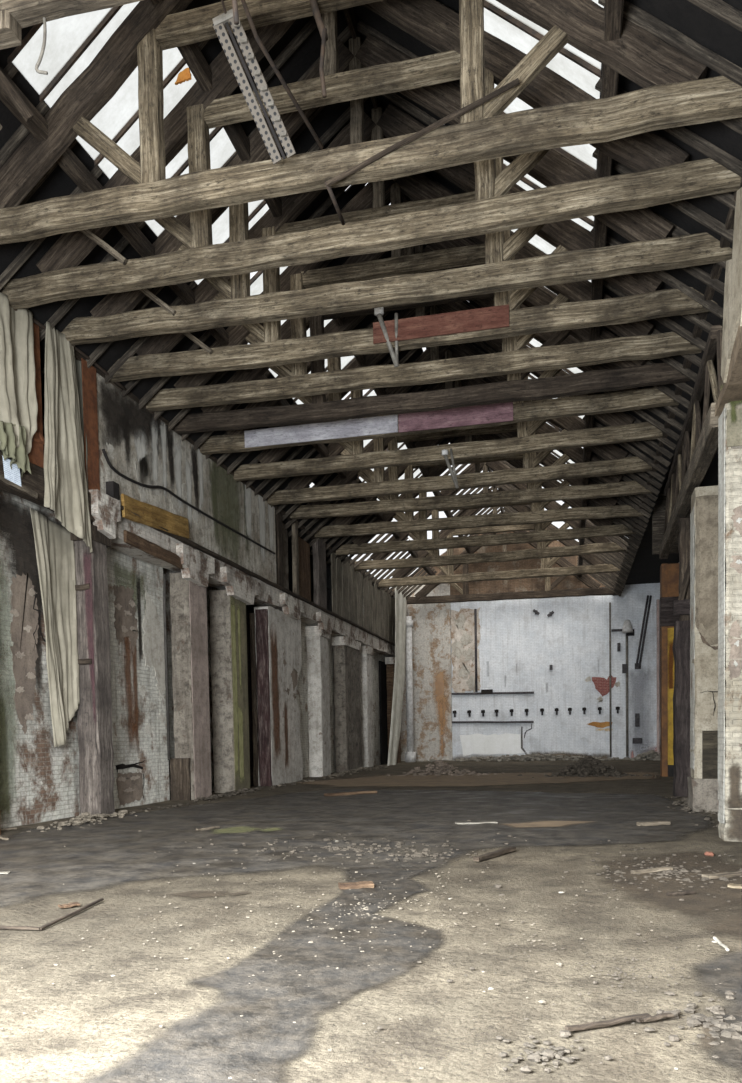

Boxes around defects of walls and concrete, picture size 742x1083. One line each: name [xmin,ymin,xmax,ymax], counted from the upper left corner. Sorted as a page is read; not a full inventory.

damp [101,383,218,539]
damp [244,484,274,561]
peeling [731,506,742,536]
corrosion [124,580,142,746]
corrosion [434,672,447,753]
peeling [585,675,620,702]
spalling [728,620,742,679]